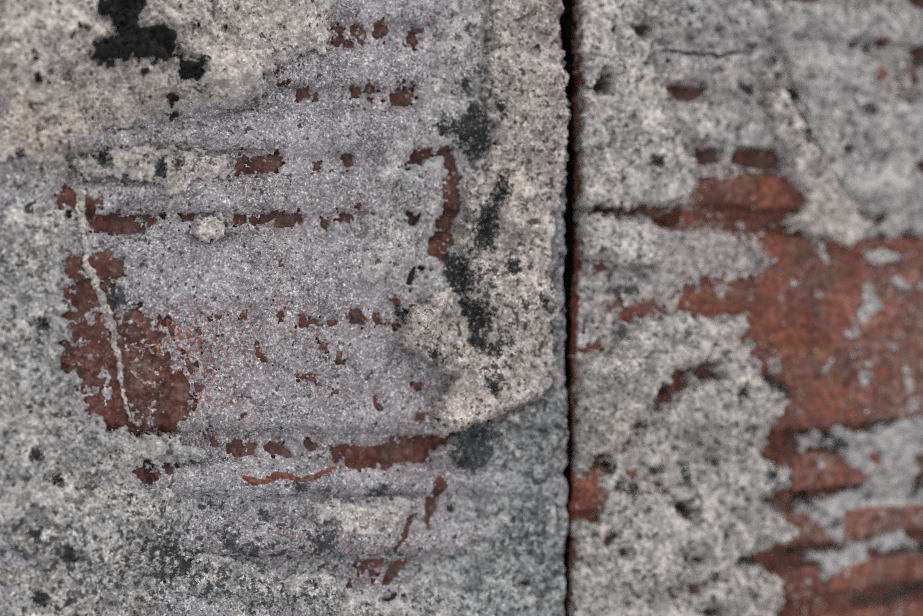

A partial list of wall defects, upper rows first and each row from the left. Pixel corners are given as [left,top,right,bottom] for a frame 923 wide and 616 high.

crack [572,30,583,87]
peeling [234,154,283,177]
peeling [54,188,157,236]
peeling [233,210,304,229]
peeling [404,145,461,261]
crack [573,259,583,313]
peeling [59,248,205,434]
peeling [592,145,923,616]
peeling [133,459,176,487]
peeling [203,433,292,458]
peeling [329,432,453,472]
crack [567,547,576,607]